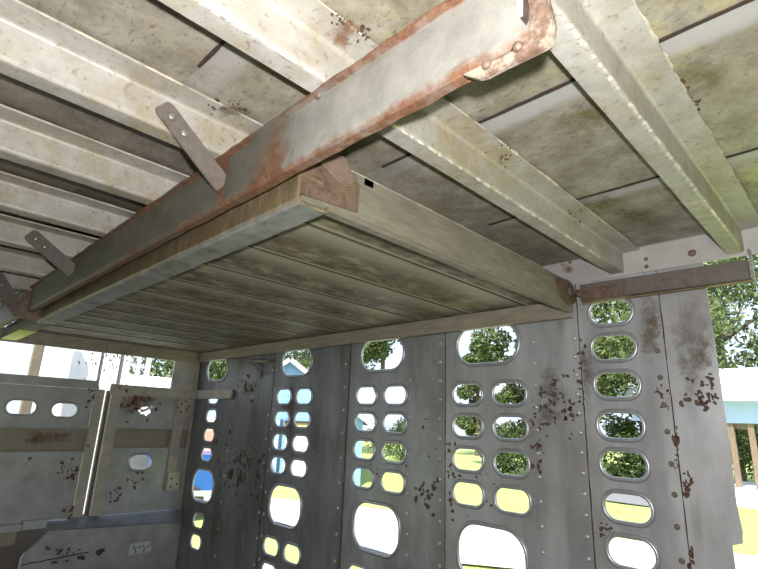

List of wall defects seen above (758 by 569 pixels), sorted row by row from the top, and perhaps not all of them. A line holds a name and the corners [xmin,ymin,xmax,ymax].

rust [119,386,161,423]